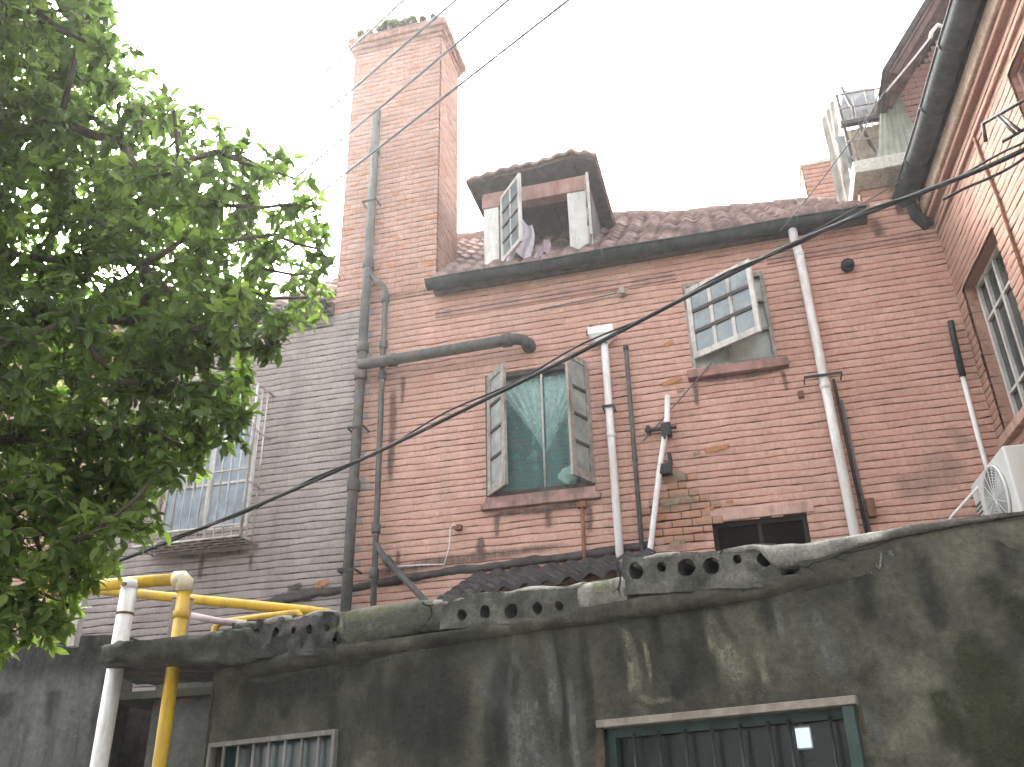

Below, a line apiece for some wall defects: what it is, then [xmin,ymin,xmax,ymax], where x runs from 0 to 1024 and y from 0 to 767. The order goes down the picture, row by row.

water stain [388,378,405,475]
water stain [622,617,692,704]
water stain [930,634,1024,767]